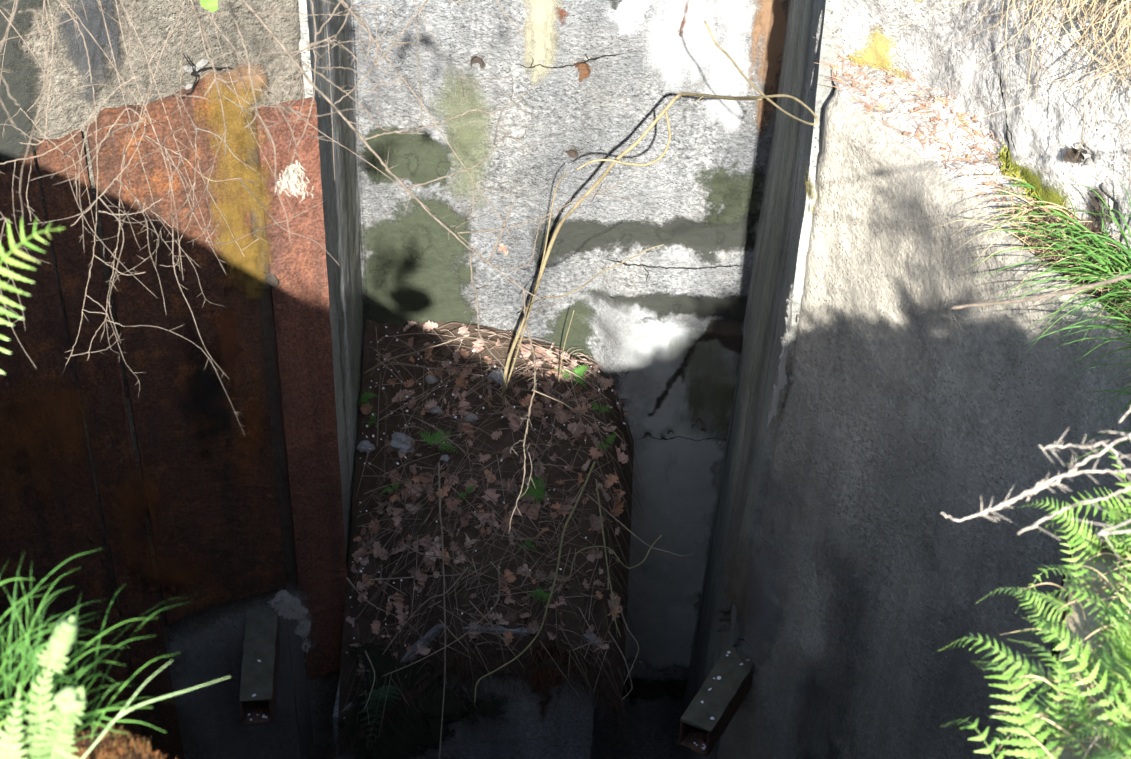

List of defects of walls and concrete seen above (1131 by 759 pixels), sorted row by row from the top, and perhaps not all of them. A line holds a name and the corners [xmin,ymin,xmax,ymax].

crack [519,52,629,69]
damp [436,80,485,190]
crack [999,61,1016,181]
rust [206,66,268,299]
damp [533,190,756,268]
damp [457,265,475,289]
crack [633,417,727,443]